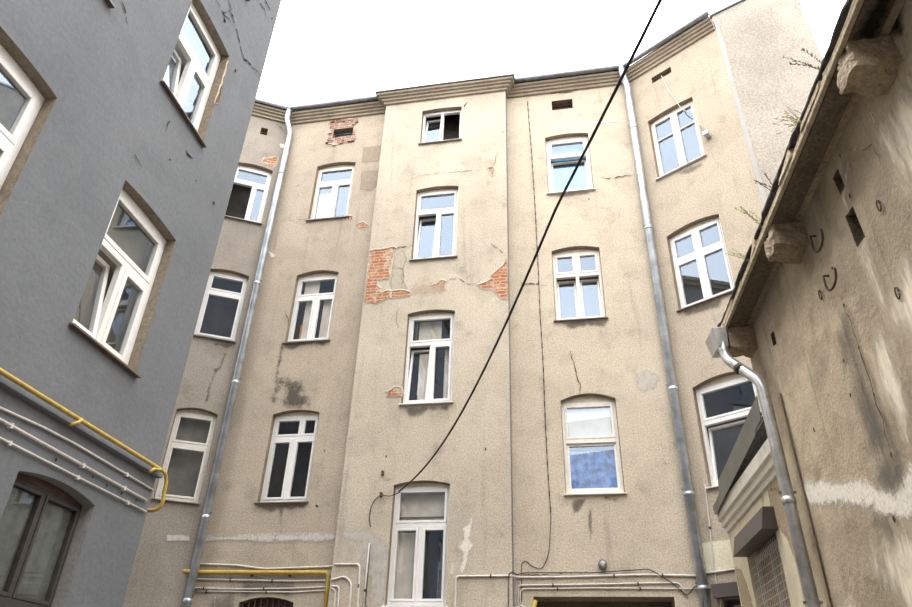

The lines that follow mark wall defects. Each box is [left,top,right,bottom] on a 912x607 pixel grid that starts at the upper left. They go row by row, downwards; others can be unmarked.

spalling [325,117,358,147]
spalling [363,245,412,305]
spalling [476,257,508,301]
leakage [272,343,307,408]
spalling [385,385,404,398]
peeling [451,516,473,574]